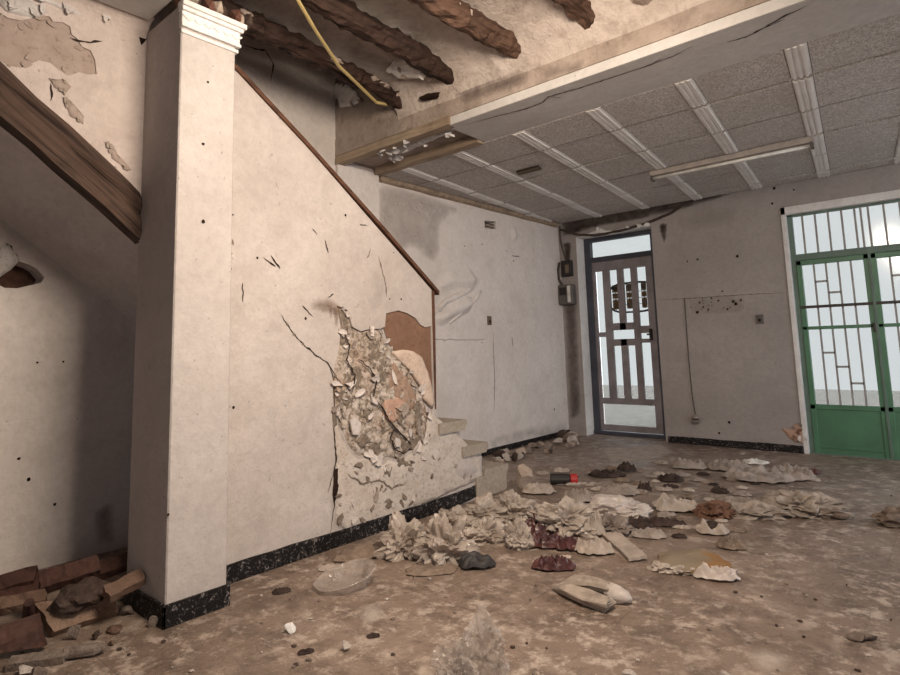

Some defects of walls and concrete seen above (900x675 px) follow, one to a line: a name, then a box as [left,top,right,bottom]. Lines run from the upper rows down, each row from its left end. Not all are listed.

spalling [0,0,96,125]
spalling [386,59,433,81]
crack [729,6,806,42]
spalling [0,243,36,288]
crack [282,316,343,532]
spalling [330,306,484,529]